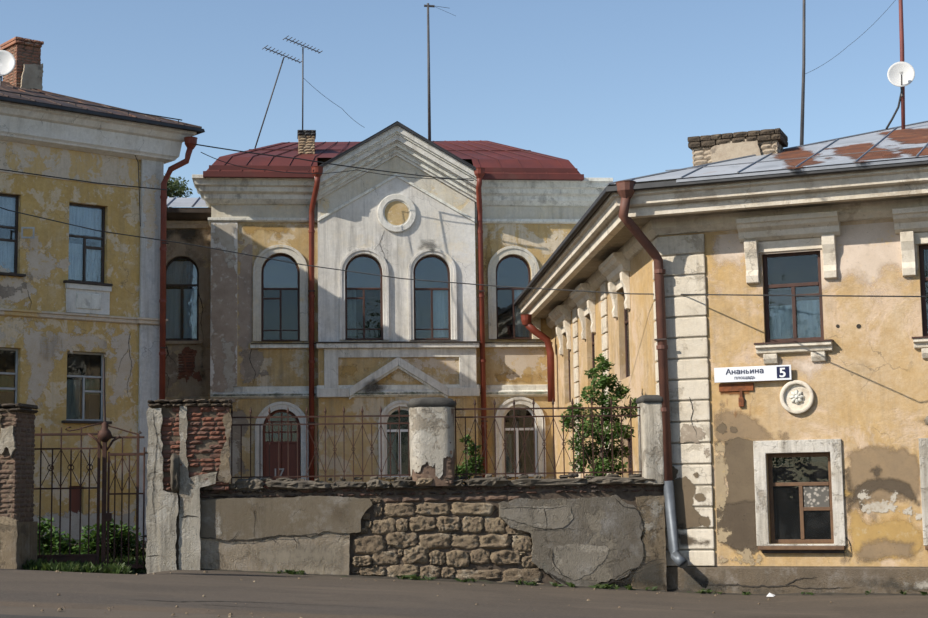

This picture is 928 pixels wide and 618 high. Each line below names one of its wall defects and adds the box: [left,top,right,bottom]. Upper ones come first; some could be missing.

peeling [0,234,136,410]
flaking render [0,413,17,458]
peeling [145,240,269,574]
flaking render [350,407,558,584]
flaking render [672,419,732,545]
peeling [718,548,762,566]
peeling [844,489,923,561]